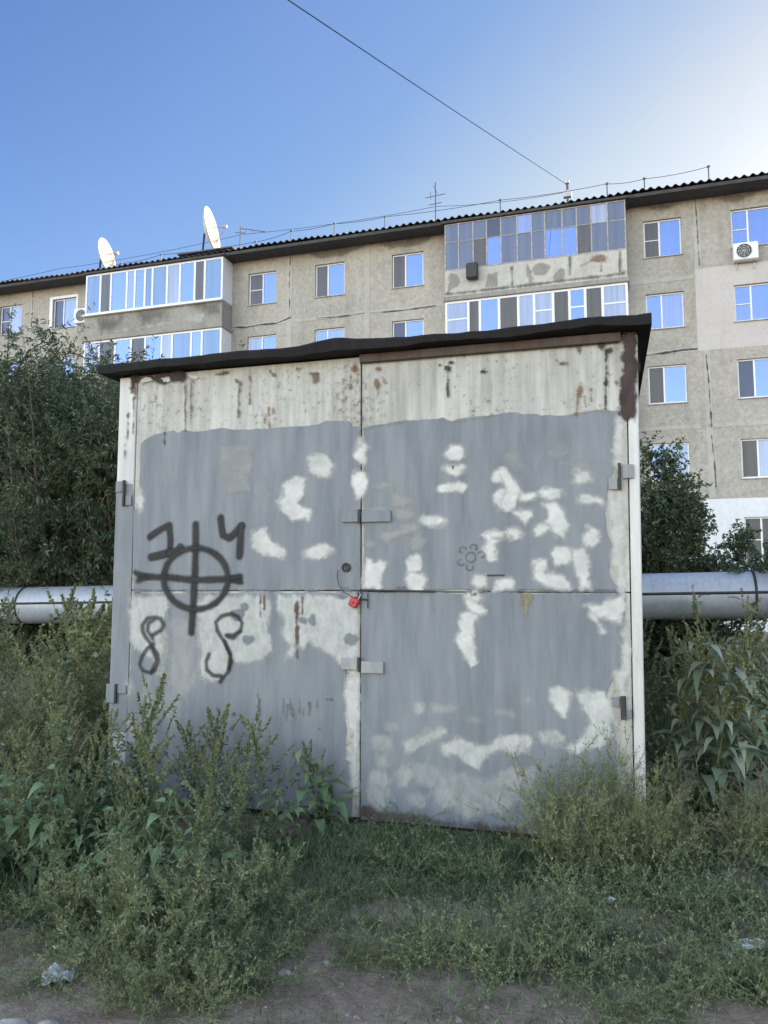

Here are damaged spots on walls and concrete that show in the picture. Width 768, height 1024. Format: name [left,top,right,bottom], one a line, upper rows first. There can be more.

corrosion [215,371,251,418]